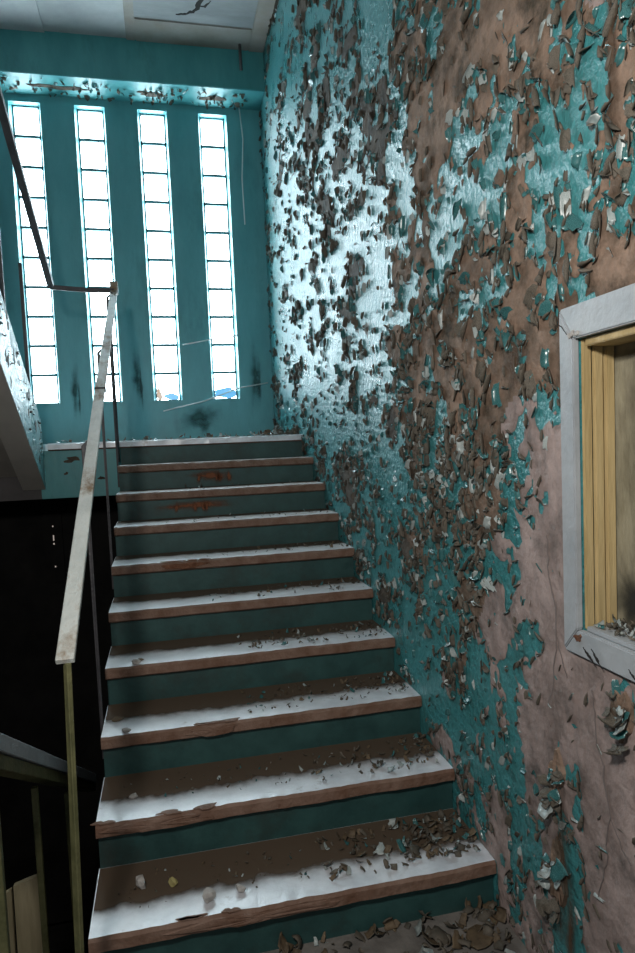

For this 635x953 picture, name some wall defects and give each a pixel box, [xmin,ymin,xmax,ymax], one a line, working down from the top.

crack [176,0,211,15]
spalling [11,378,43,461]
peeling [259,0,635,953]